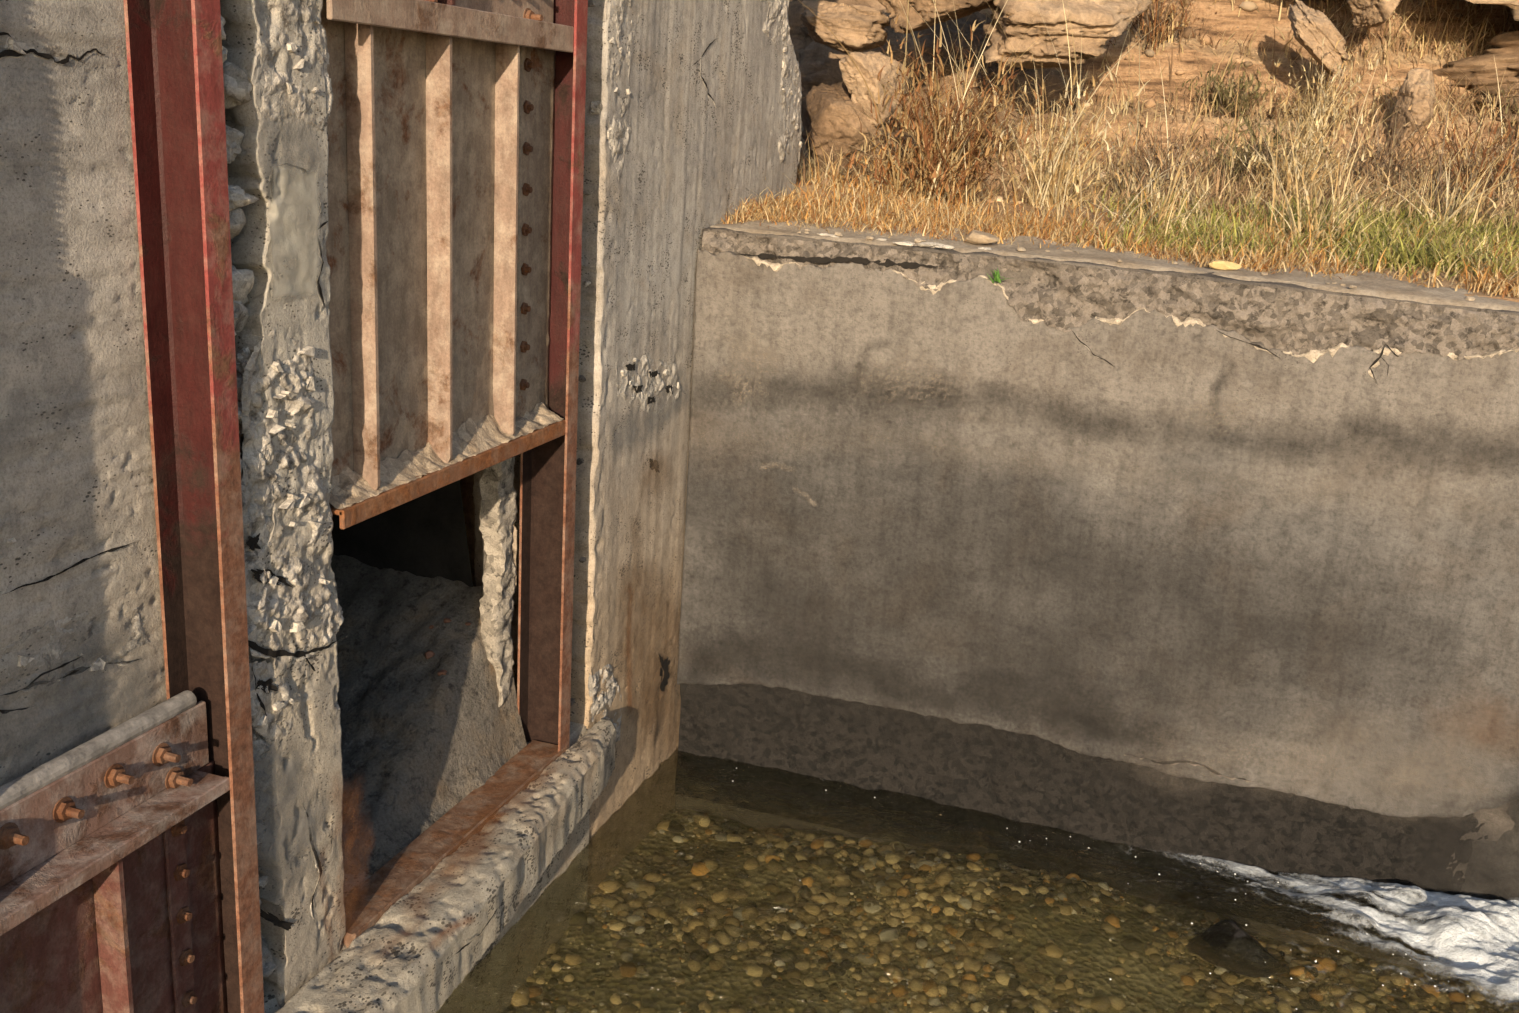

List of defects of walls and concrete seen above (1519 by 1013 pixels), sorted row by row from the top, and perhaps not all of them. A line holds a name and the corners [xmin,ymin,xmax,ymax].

crack [0,32,106,66]
spalling [221,0,333,165]
spalling [228,185,259,239]
peeling [316,202,328,306]
spalling [701,231,1519,363]
spalling [616,354,683,414]
crack [5,541,137,594]
crack [0,655,141,714]
damp [1426,824,1519,905]
spalling [261,931,278,983]